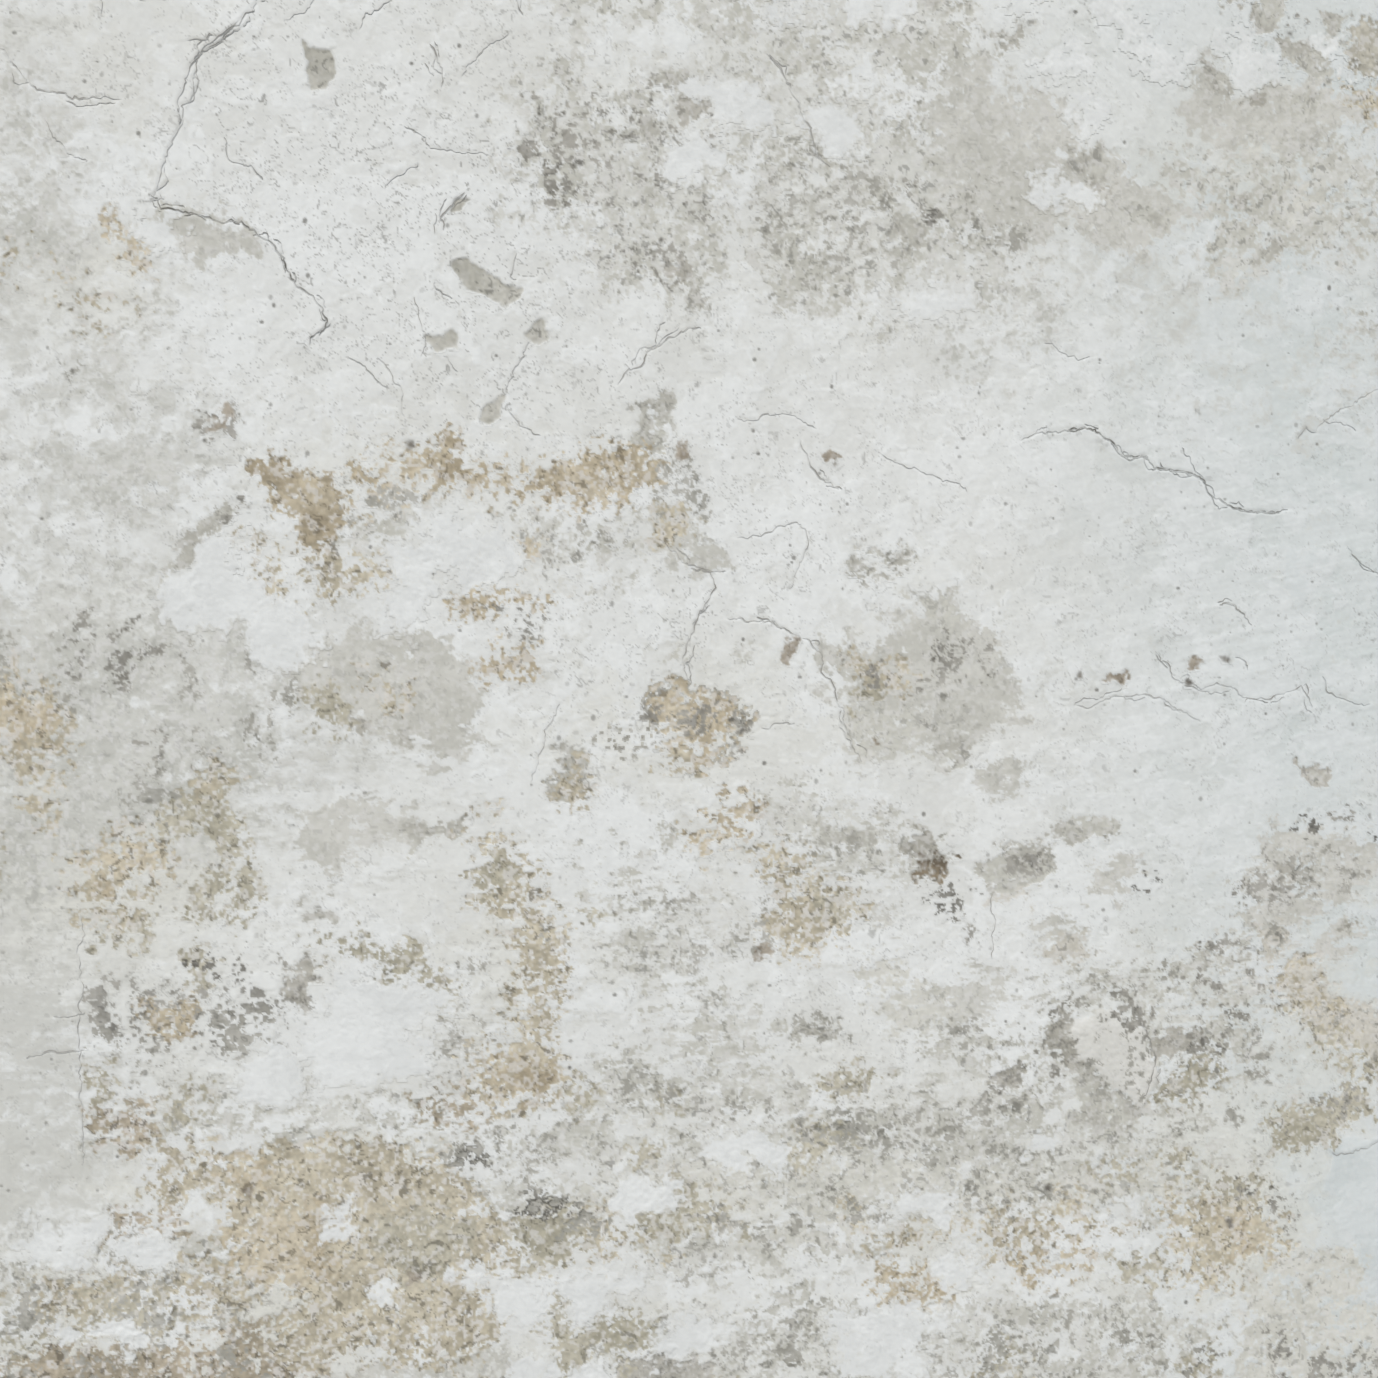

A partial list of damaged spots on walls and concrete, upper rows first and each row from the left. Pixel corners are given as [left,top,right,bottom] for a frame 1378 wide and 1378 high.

peeling [300,38,338,92]
crack [425,0,523,86]
crack [151,0,331,343]
peeling [448,0,1378,353]
crack [345,281,457,414]
crack [1023,424,1288,514]
crack [660,539,867,760]
leakage [891,822,989,948]
leakage [1220,778,1378,918]
leakage [636,984,857,1075]
leakage [1068,931,1378,1164]
leakage [1000,1299,1233,1378]